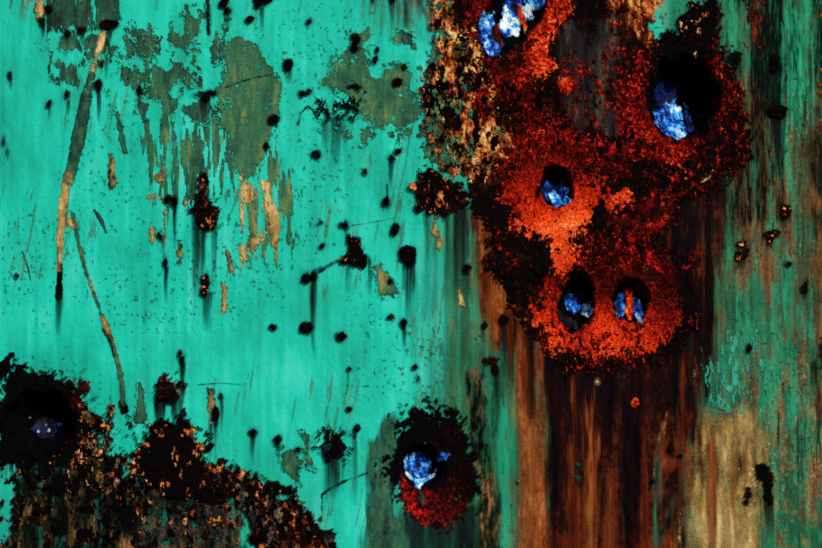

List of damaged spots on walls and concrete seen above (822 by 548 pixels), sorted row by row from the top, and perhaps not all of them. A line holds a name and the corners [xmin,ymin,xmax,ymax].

rust [100,19,120,45]
rust [94,79,103,110]
peeling [319,0,475,177]
peeling [33,0,300,276]
rust [768,102,788,152]
rust [164,194,178,233]
rust [188,170,222,313]
rust [338,220,371,275]
rust [365,0,775,548]
rust [764,204,792,247]
rust [0,349,338,548]
rust [273,424,361,487]